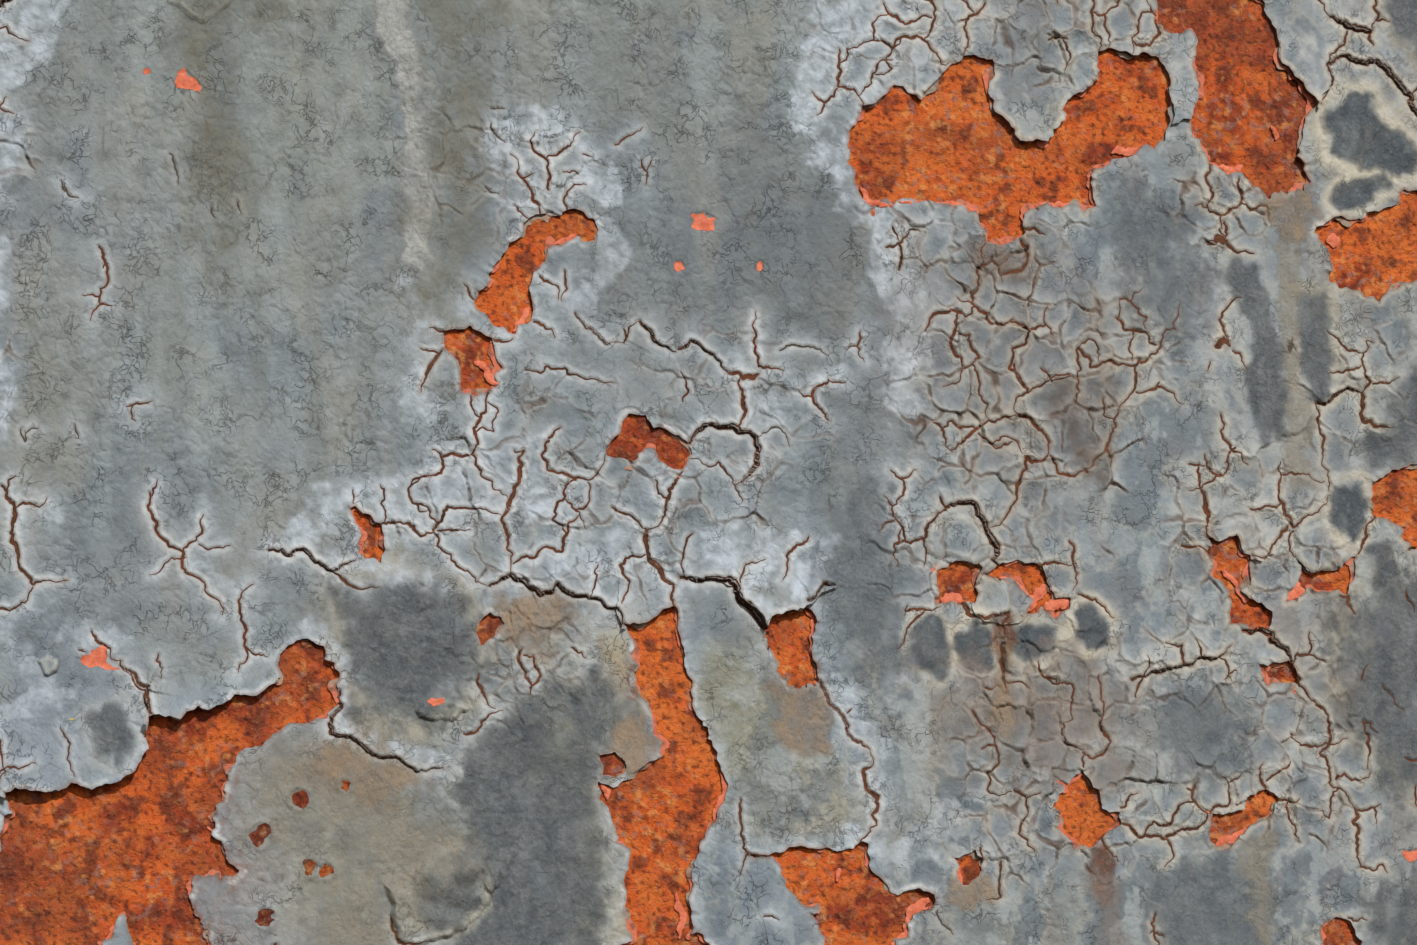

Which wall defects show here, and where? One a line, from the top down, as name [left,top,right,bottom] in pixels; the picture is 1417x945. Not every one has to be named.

peeling [848,0,1331,242]
crack [352,270,865,650]
crack [878,226,1181,567]
crack [1181,330,1399,559]
peeling [0,639,339,945]
corrosion [249,823,271,847]
corrosion [255,909,275,926]
corrosion [292,790,309,809]
corrosion [303,859,334,877]
peeling [598,539,838,945]
peeling [752,843,933,945]
crack [896,602,1404,900]